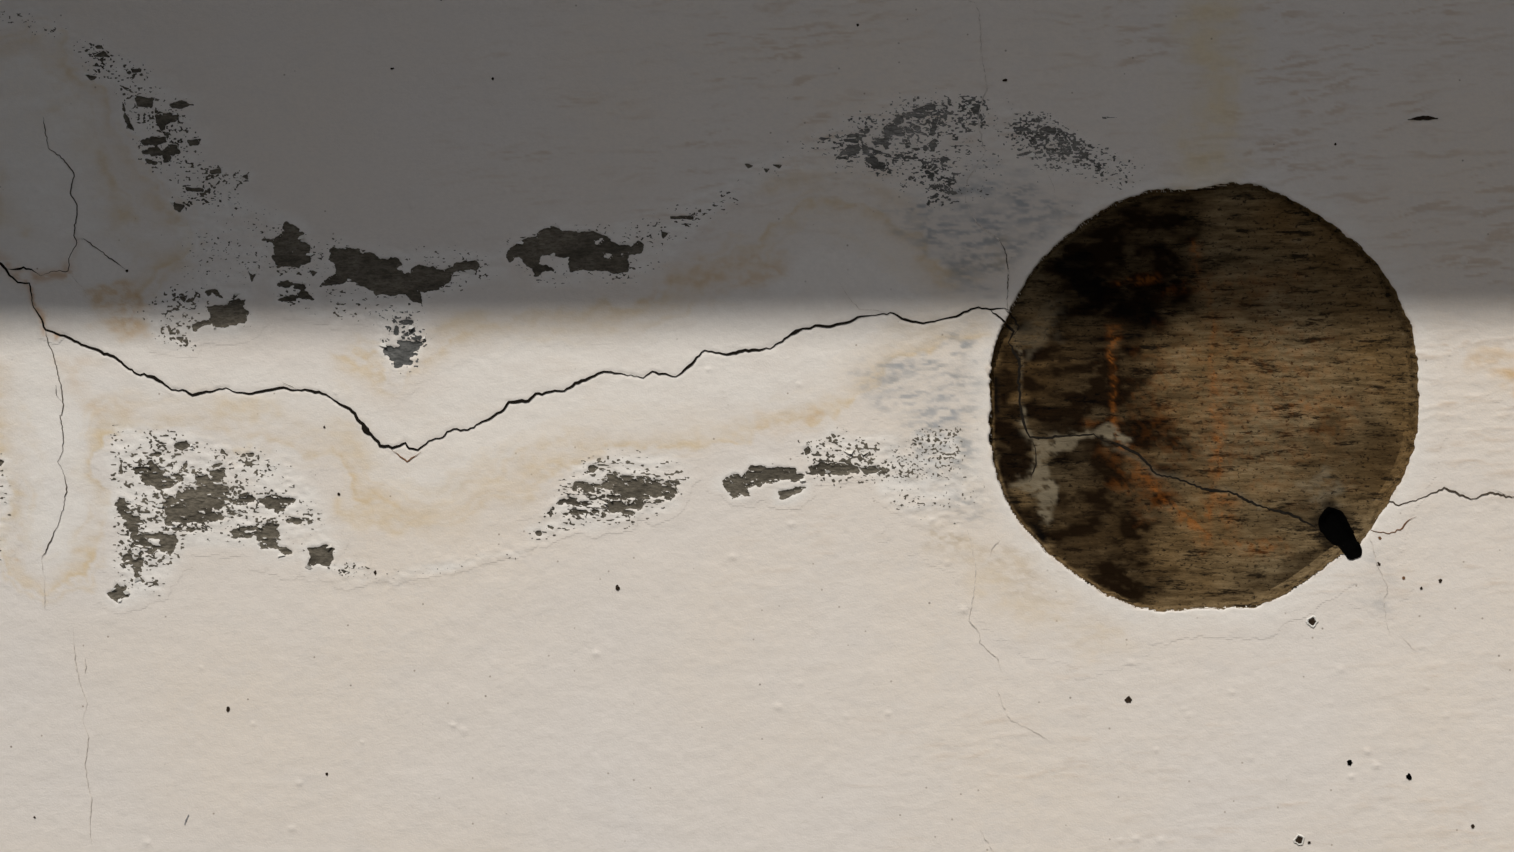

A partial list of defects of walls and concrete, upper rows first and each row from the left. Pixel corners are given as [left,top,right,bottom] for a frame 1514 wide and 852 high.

peeling [0,0,739,394]
water stain [0,29,1065,610]
peeling [90,413,985,614]
crack [0,0,1320,612]
peeling [750,79,1145,212]